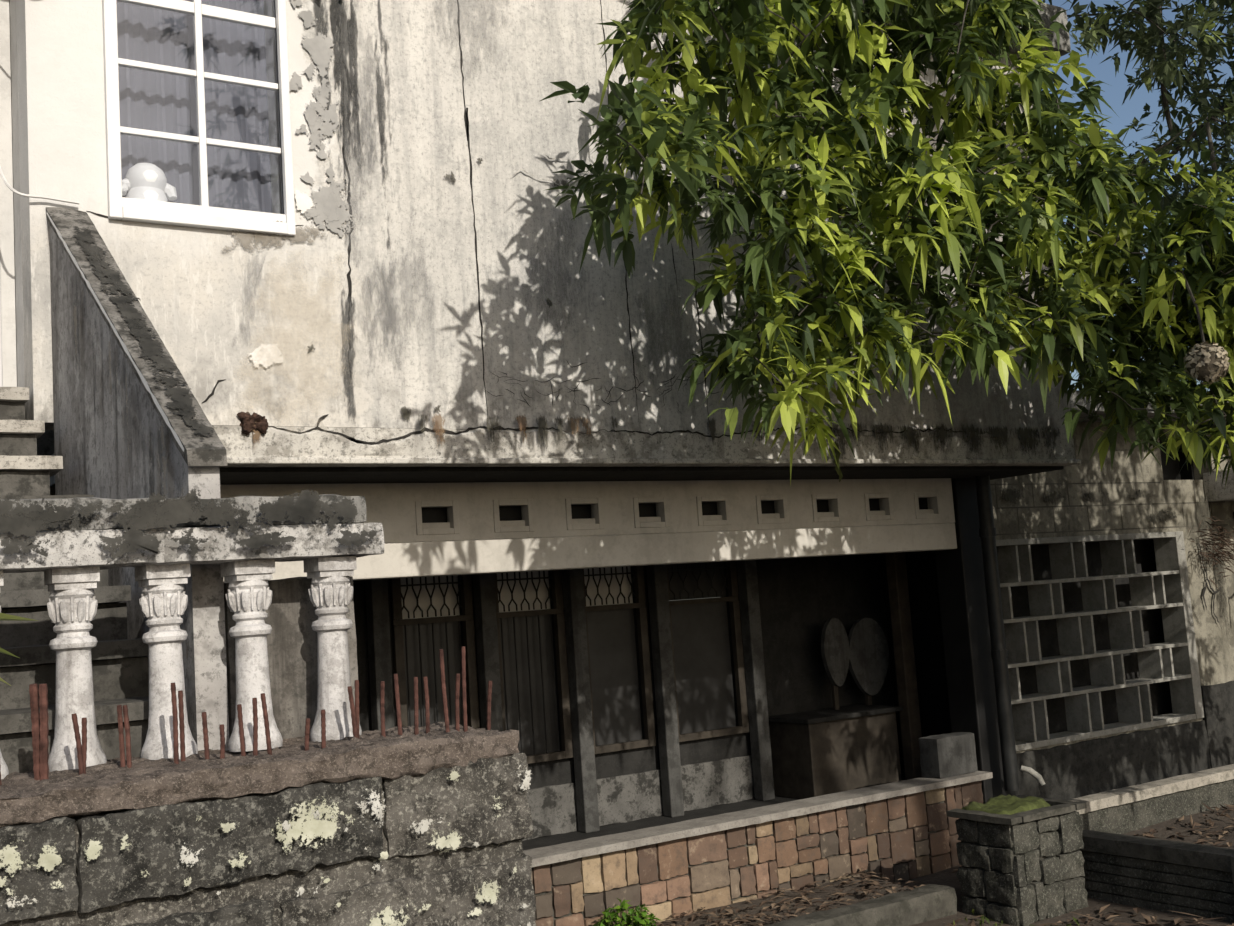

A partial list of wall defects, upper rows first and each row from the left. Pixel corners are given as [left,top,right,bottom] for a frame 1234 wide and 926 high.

peeling [289,0,356,237]
water stain [314,0,362,170]
water stain [375,0,392,178]
water stain [223,221,323,253]
crack [269,0,988,453]
water stain [71,225,214,448]
water stain [0,280,383,565]
peeling [248,343,284,368]
rust [418,414,445,443]
rust [486,416,500,445]
rust [515,415,592,447]
water stain [830,422,1060,482]